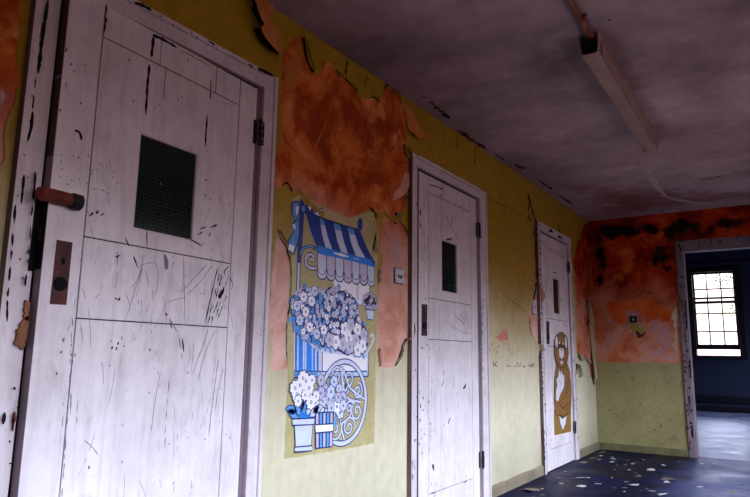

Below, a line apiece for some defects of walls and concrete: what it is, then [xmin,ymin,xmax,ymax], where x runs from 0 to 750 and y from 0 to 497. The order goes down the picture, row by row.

peeling [0,0,27,171]
peeling [27,0,49,142]
peeling [13,172,37,223]
peeling [247,0,428,371]
peeling [6,226,31,321]
peeling [528,224,545,373]
peeling [571,205,750,451]
peeling [2,407,18,431]